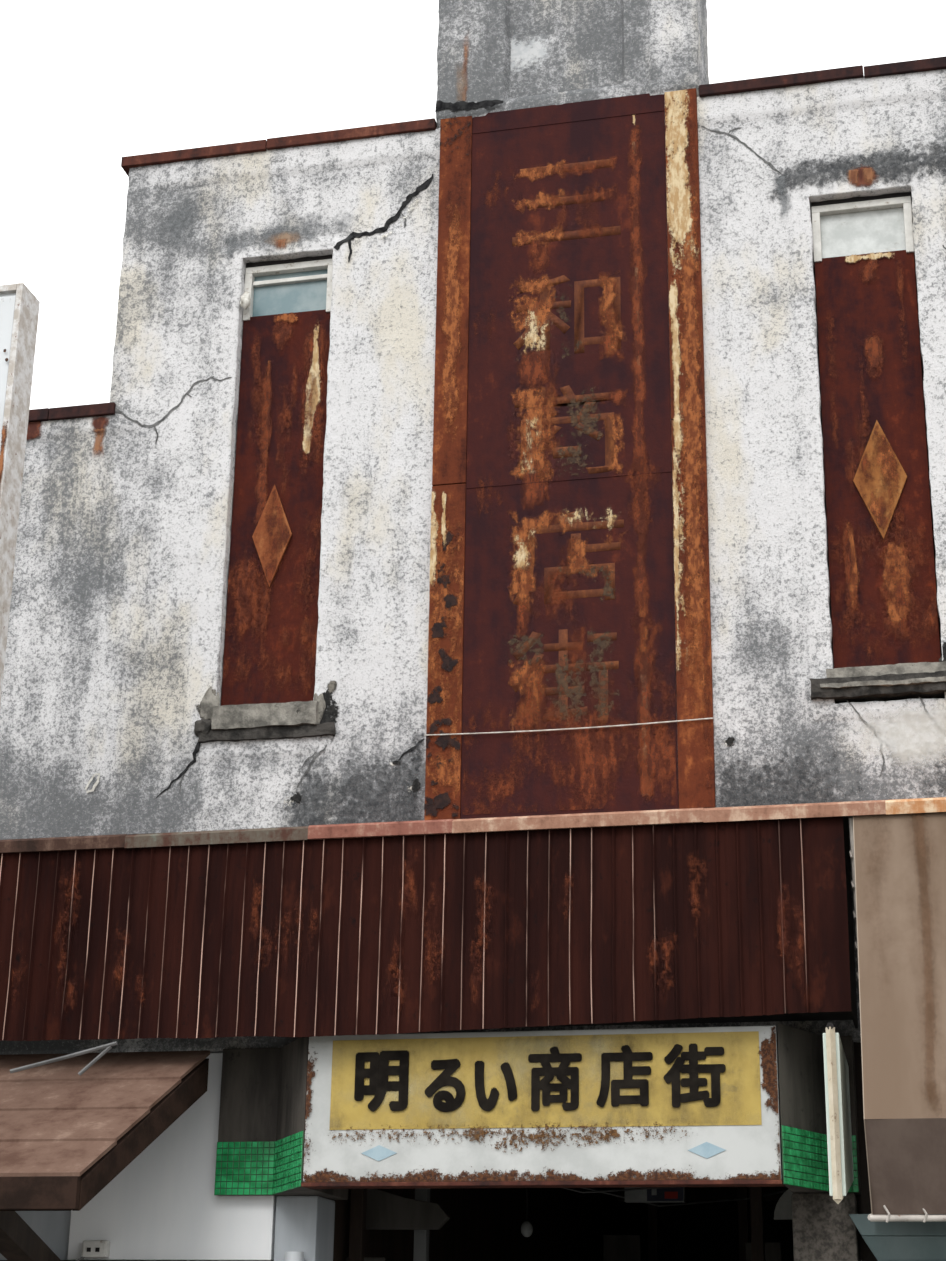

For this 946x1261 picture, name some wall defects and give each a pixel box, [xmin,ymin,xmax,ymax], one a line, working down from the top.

crack [334,173,434,263]
corrosion [845,252,891,281]
corrosion [274,313,298,346]
corrosion [864,337,883,377]
corrosion [27,421,41,440]
corrosion [92,416,108,453]
crack [115,376,231,444]
corrosion [226,327,327,687]
corrosion [836,392,938,638]
crack [156,742,201,798]